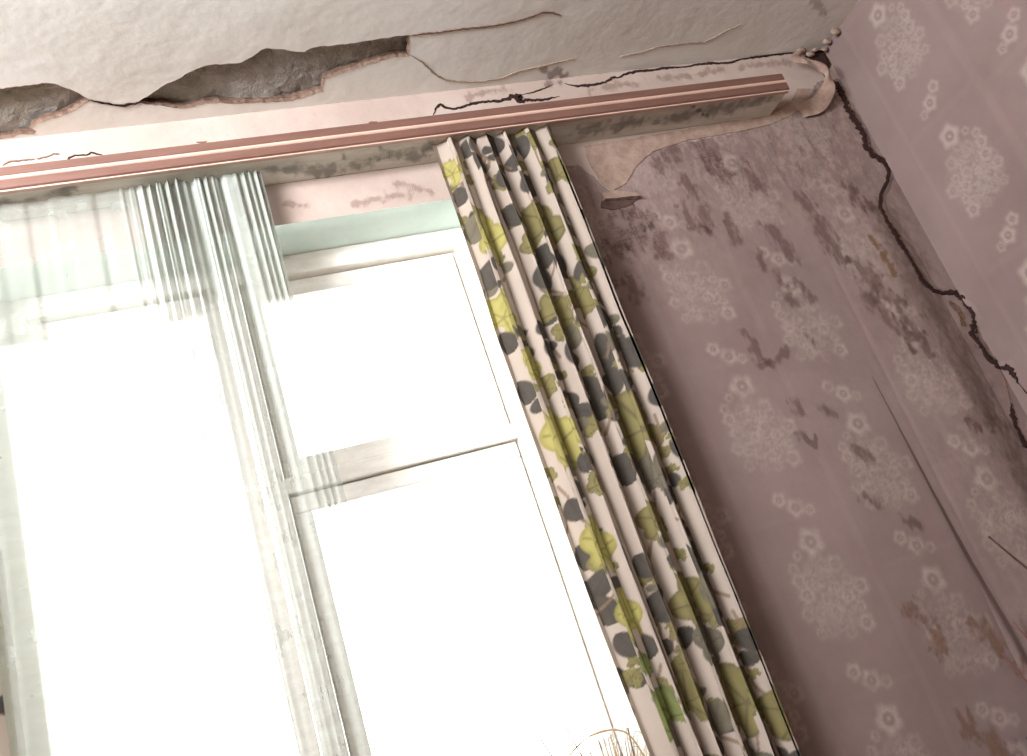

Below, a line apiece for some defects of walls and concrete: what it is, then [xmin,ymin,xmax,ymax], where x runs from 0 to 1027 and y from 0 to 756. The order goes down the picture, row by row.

spalling [0,83,89,139]
spalling [138,35,410,108]
crack [410,12,794,115]
crack [821,51,1027,449]